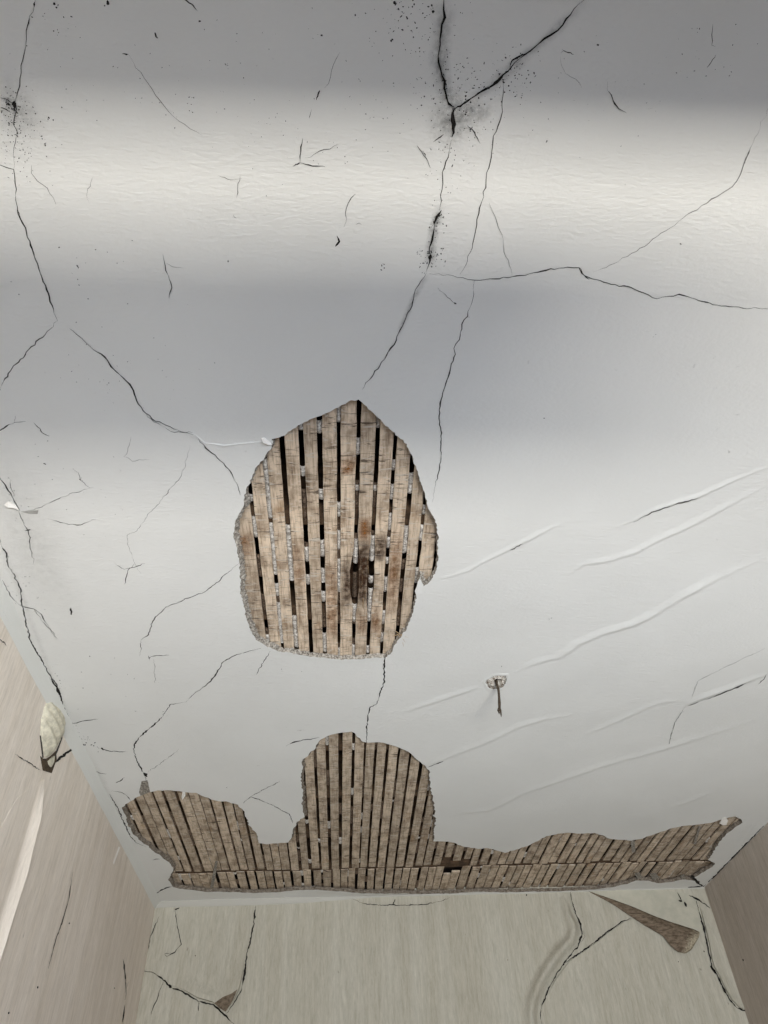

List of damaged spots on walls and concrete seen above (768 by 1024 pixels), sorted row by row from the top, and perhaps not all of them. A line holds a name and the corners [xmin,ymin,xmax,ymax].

crack [294,54,339,167]
crack [0,2,240,583]
crack [365,0,767,494]
crack [0,473,95,724]
crack [96,649,271,860]
crack [140,564,238,682]
flaking render [233,438,439,660]
crack [366,655,386,743]
flaking render [122,736,742,934]
crack [669,653,766,744]